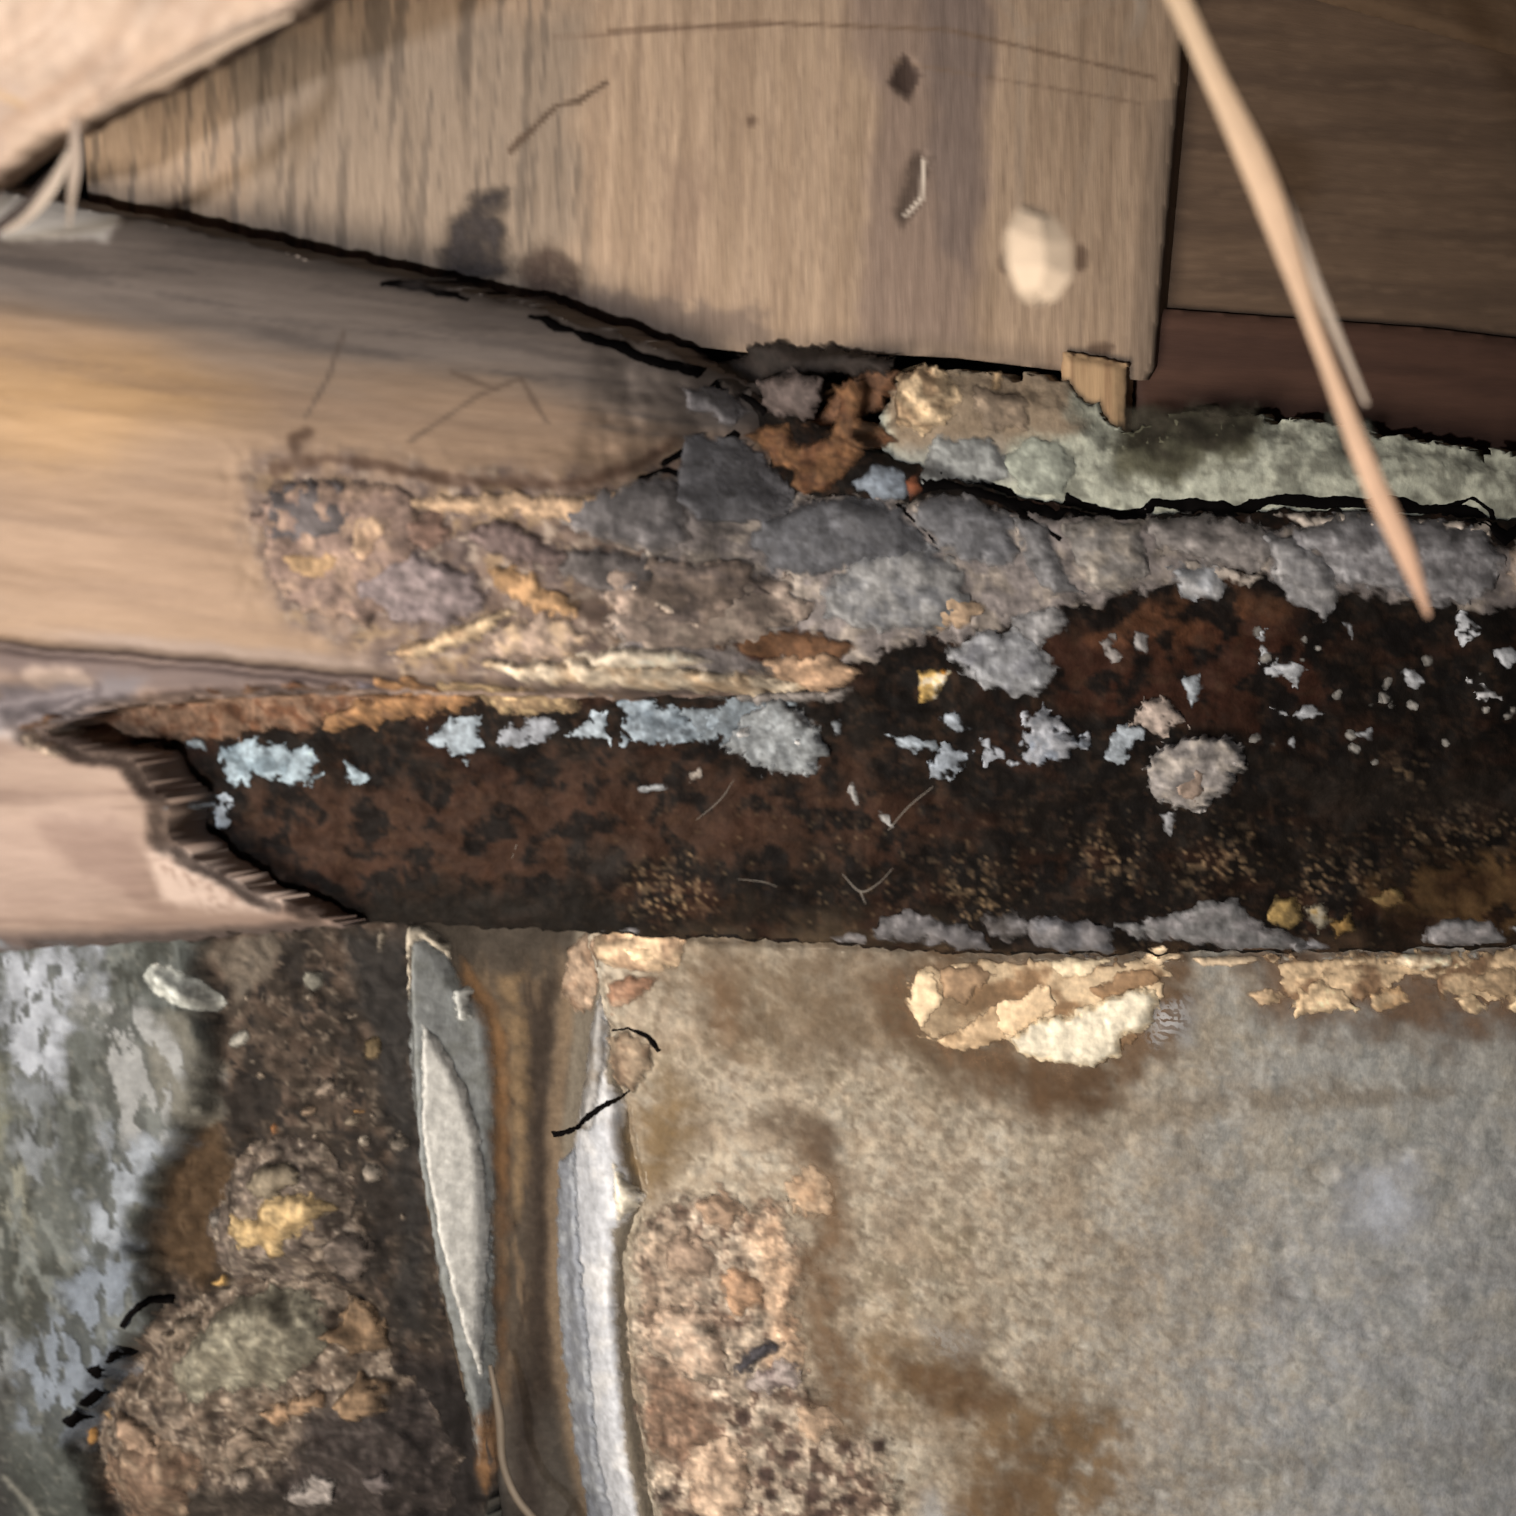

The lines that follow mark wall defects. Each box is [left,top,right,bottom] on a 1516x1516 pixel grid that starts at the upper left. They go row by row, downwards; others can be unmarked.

mould [1121,407,1259,458]
corrosion [20,676,578,758]
corrosion [1414,856,1516,927]
spalling [834,898,1516,1108]
damp [0,942,184,1437]
peeling [406,925,498,1456]
spalling [556,928,903,1516]